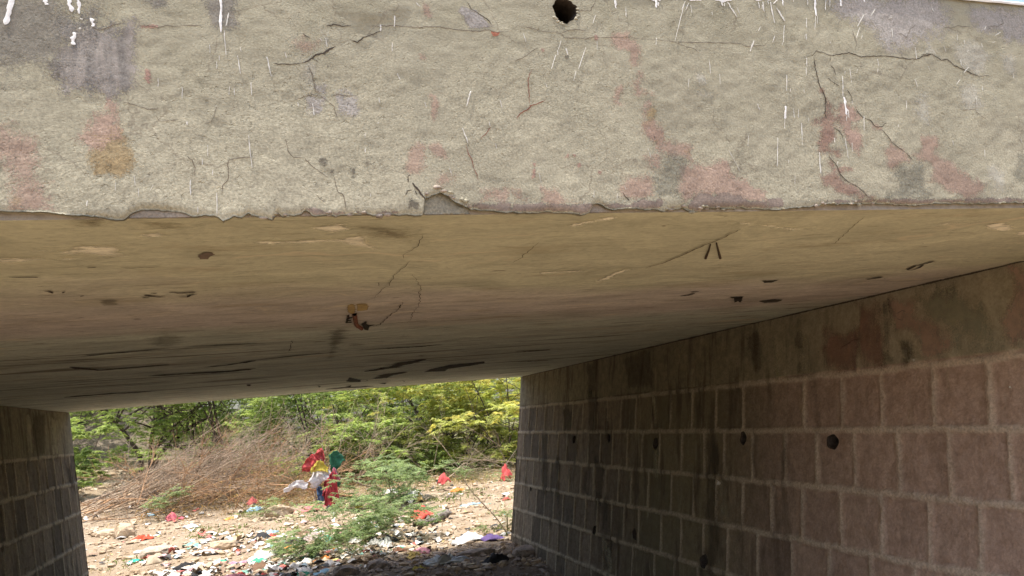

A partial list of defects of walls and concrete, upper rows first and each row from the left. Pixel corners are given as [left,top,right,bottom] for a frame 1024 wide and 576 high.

crack [273,0,765,121]
crack [812,24,989,244]
crack [285,139,346,208]
crack [405,175,425,199]
peeling [259,185,785,219]
crack [646,230,738,268]
crack [325,237,442,390]